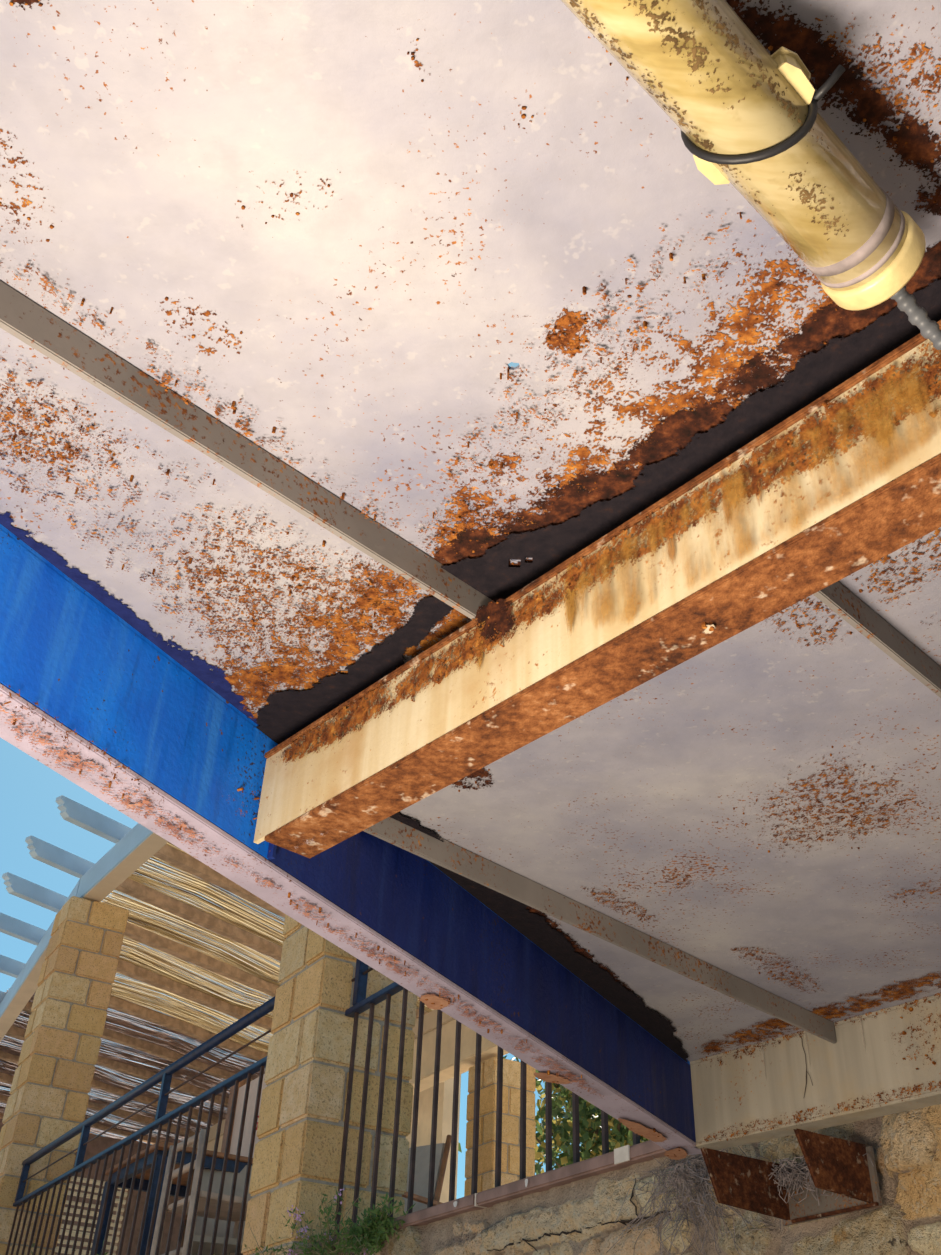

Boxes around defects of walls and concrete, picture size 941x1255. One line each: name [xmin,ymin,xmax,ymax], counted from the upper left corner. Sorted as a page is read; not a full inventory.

corrosion [9,0,49,10]
corrosion [0,129,128,356]
corrosion [236,169,341,238]
corrosion [726,0,941,217]
corrosion [0,212,941,766]
corrosion [0,685,604,1099]
corrosion [427,860,812,1068]
corrosion [704,946,941,1142]
corrosion [733,746,933,858]
crack [487,1178,695,1251]